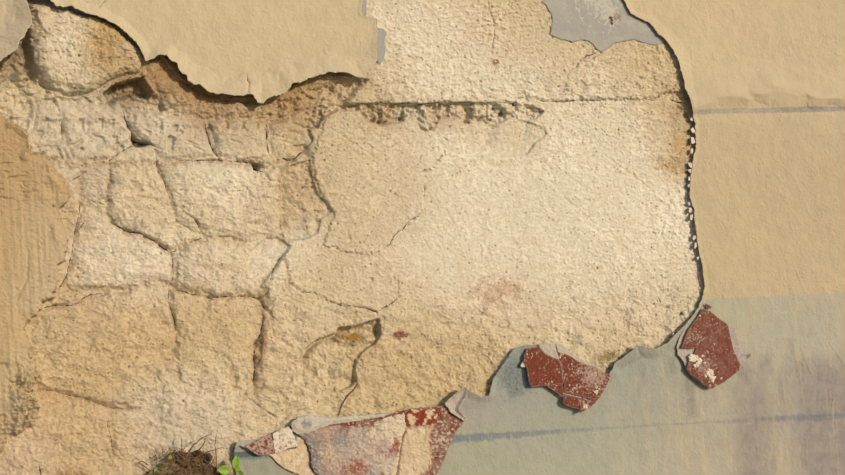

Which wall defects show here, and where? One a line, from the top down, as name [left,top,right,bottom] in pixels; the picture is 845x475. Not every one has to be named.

peeling [143,57,280,118]
crack [180,122,302,172]
spalling [461,120,547,158]
peeling [67,207,173,291]
peeling [106,154,175,246]
crack [44,115,283,418]
peeling [176,237,260,299]
peeling [156,161,283,257]
peeling [30,289,177,405]
peeling [170,290,265,393]
crack [45,390,124,456]
peeling [268,387,467,475]